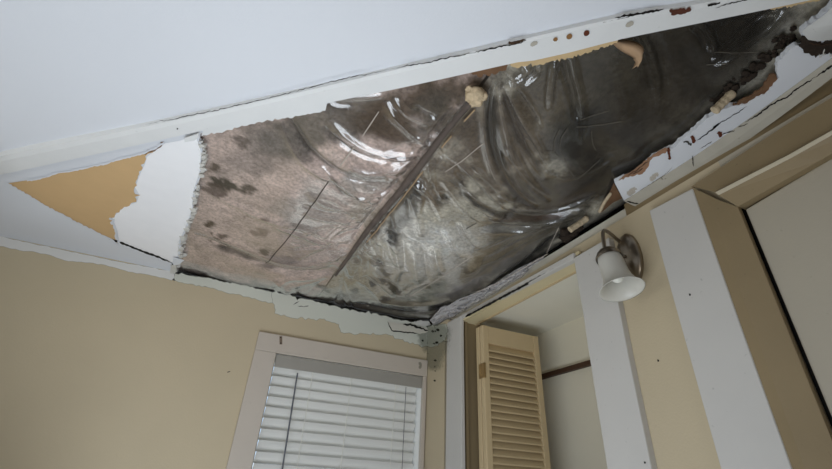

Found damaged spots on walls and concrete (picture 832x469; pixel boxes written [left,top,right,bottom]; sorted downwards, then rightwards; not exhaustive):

peeling [669,7,691,16]
peeling [613,39,644,69]
crack [698,65,832,149]
peeling [113,139,207,274]
flaking render [387,320,431,334]